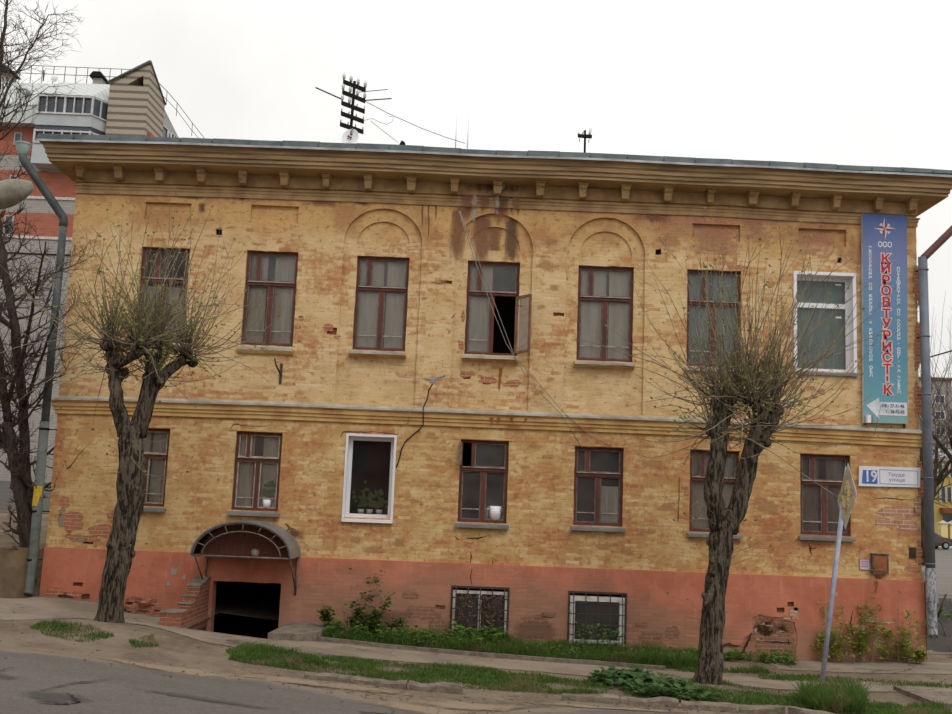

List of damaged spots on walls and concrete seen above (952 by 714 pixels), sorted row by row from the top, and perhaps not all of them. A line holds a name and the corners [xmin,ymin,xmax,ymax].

peeling [875,456,924,572]
peeling [750,602,799,659]